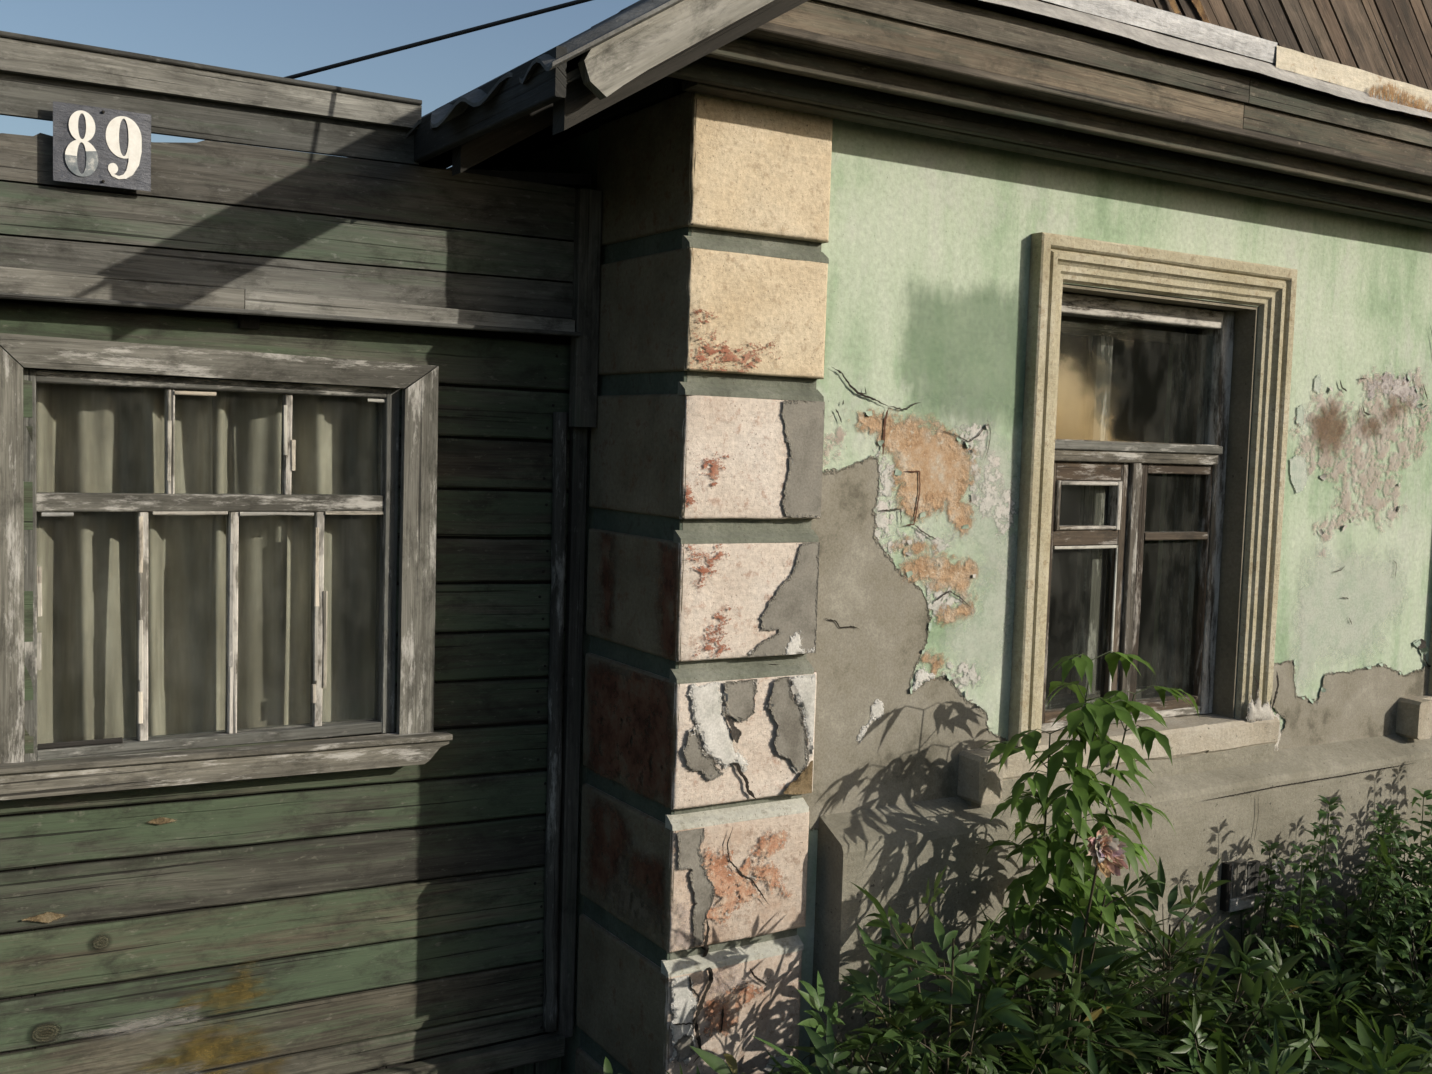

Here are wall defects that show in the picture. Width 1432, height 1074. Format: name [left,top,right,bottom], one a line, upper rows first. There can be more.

peeling [658,541,730,657]
spalling [682,400,1018,830]
peeling [1272,367,1432,751]
flaking render [674,828,792,949]
crack [673,916,724,1062]
flaking render [669,967,771,1065]